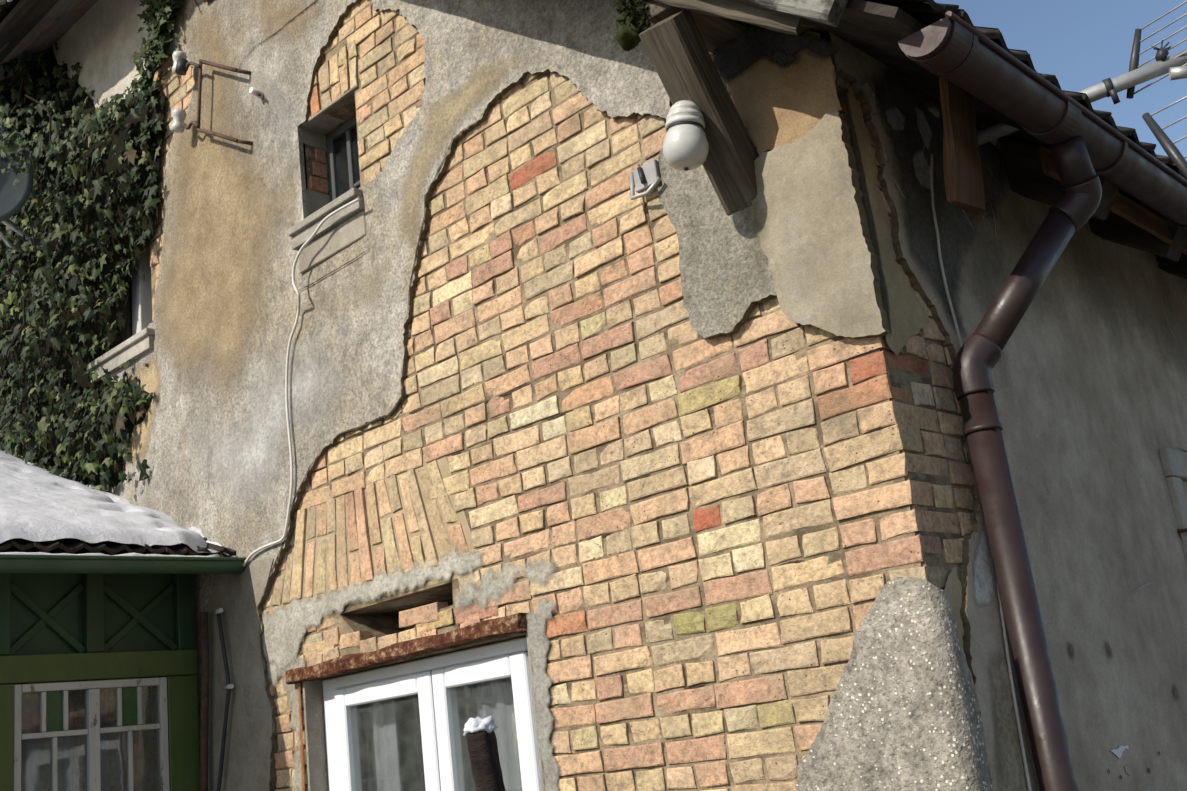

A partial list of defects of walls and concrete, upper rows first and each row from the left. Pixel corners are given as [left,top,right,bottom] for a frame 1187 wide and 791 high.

flaking render [305,0,426,186]
flaking render [258,50,981,791]
damp [873,70,1038,329]
damp [1059,239,1187,356]